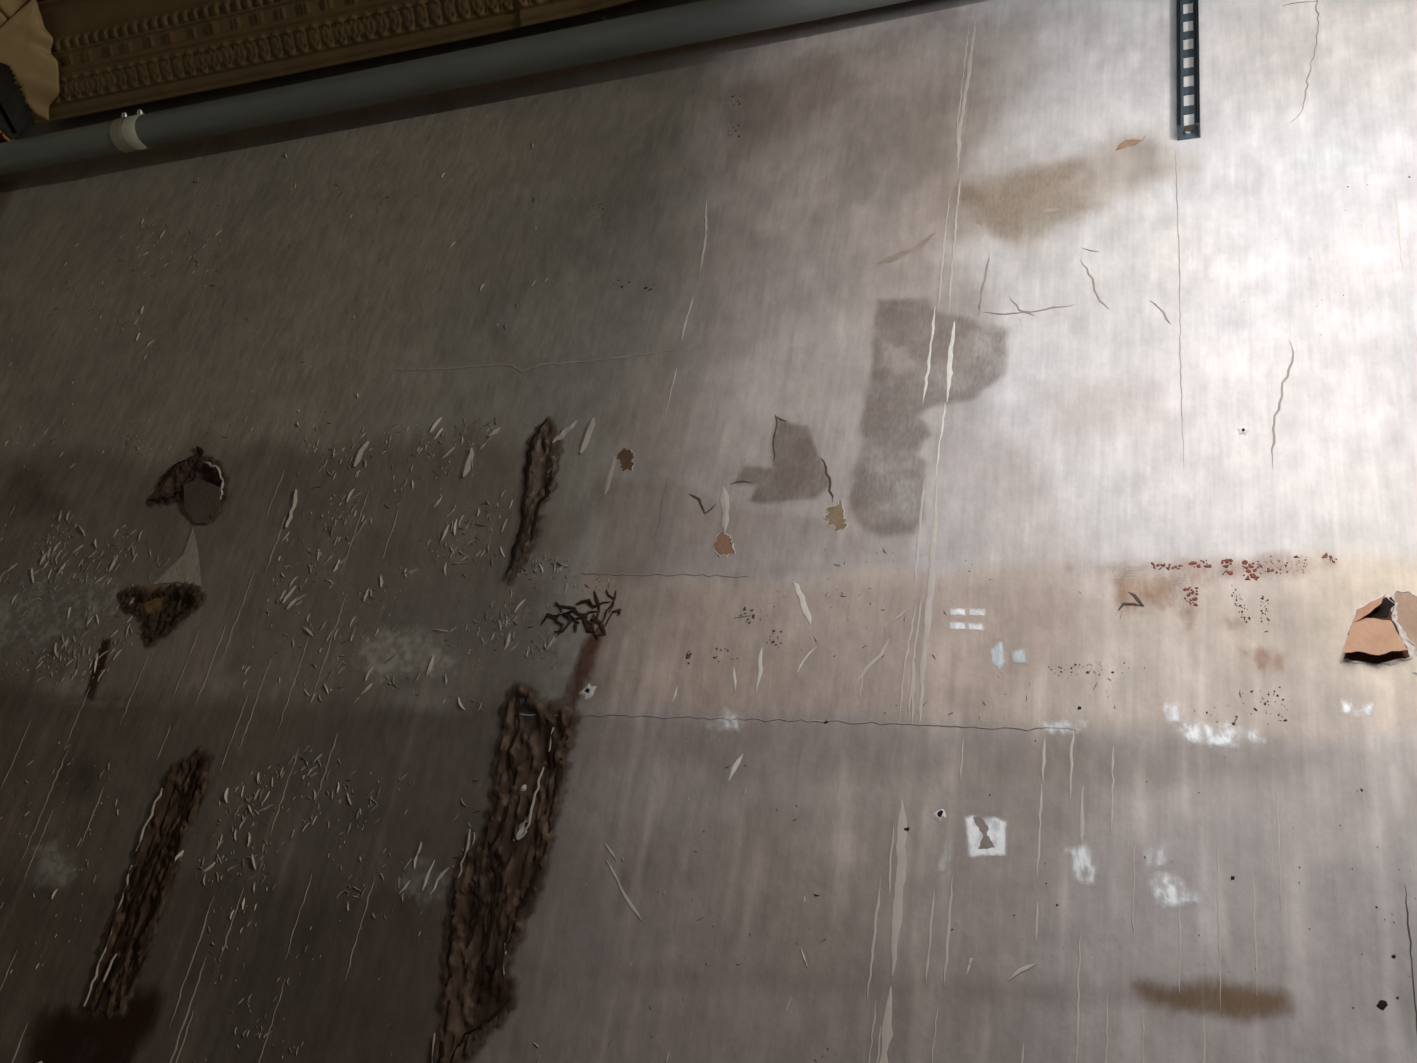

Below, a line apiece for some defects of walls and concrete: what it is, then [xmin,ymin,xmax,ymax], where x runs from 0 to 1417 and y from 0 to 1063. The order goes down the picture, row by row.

damp [877,175,961,401]
spalling [25,728,119,921]
spalling [0,416,262,688]
spalling [83,745,422,1017]
spalling [266,403,616,1063]
damp [894,406,945,722]
damp [1144,839,1284,1063]
peeling [1391,591,1417,675]